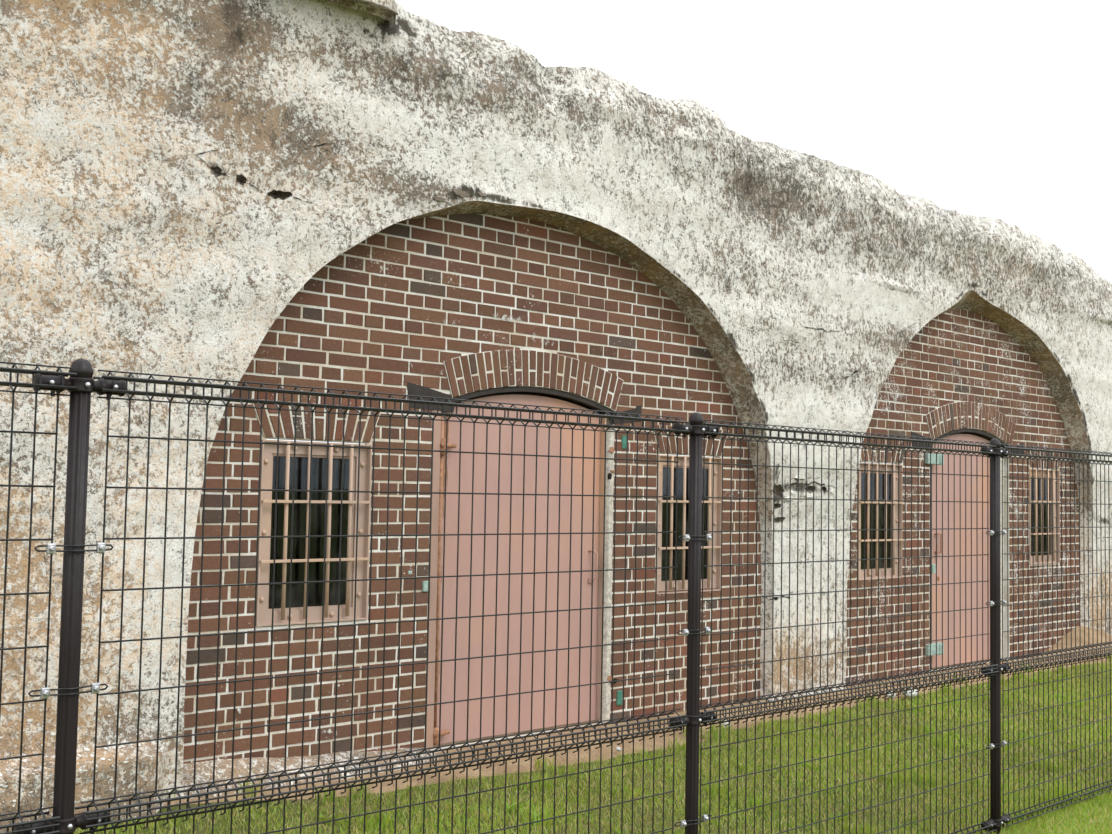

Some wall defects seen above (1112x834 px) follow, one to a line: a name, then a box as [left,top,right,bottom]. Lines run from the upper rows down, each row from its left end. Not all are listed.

spalling [267,190,292,200]
spalling [770,476,835,523]